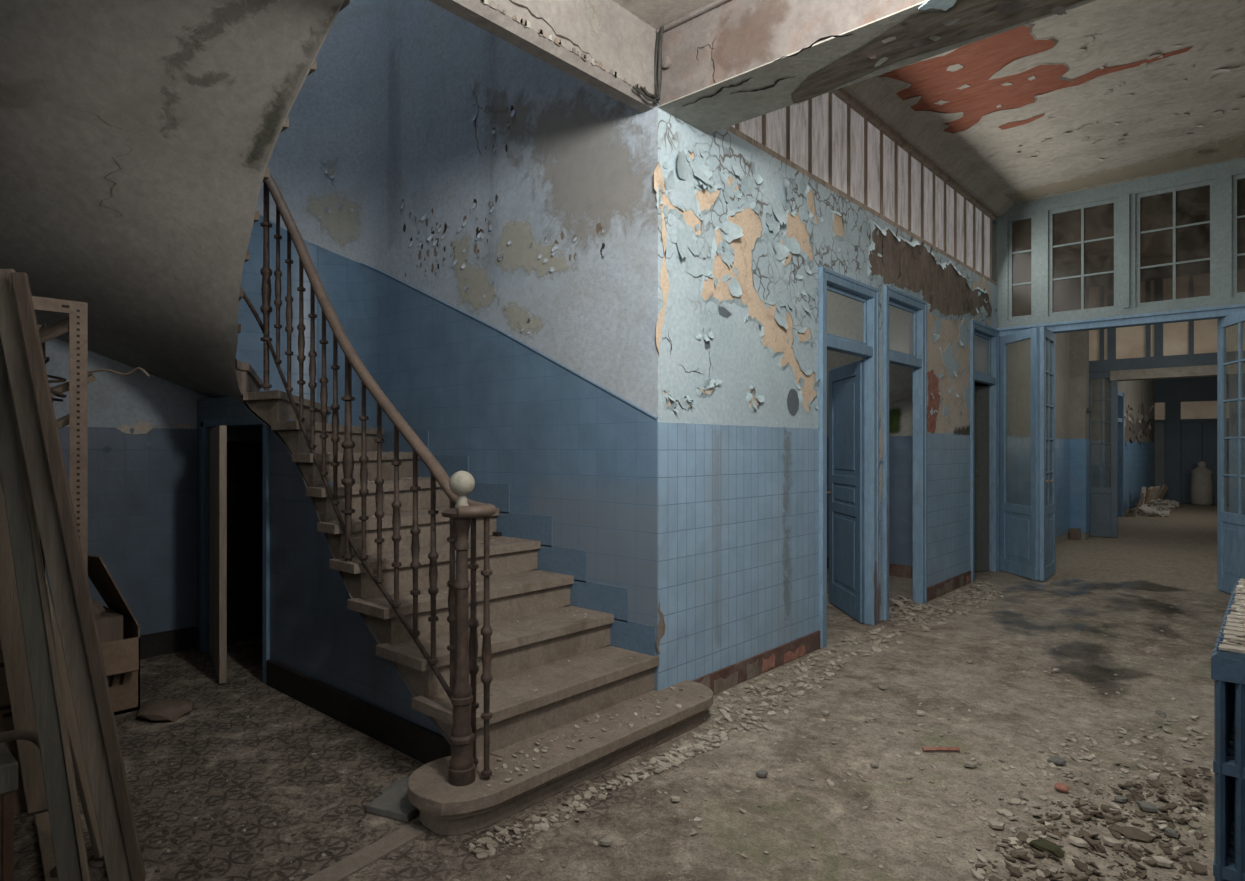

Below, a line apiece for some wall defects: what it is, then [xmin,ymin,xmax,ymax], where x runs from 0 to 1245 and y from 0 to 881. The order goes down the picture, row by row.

crack [509,0,601,63]
crack [696,36,717,90]
peeling [684,0,1192,134]
peeling [400,194,578,277]
peeling [596,223,606,257]
peeling [654,146,992,435]